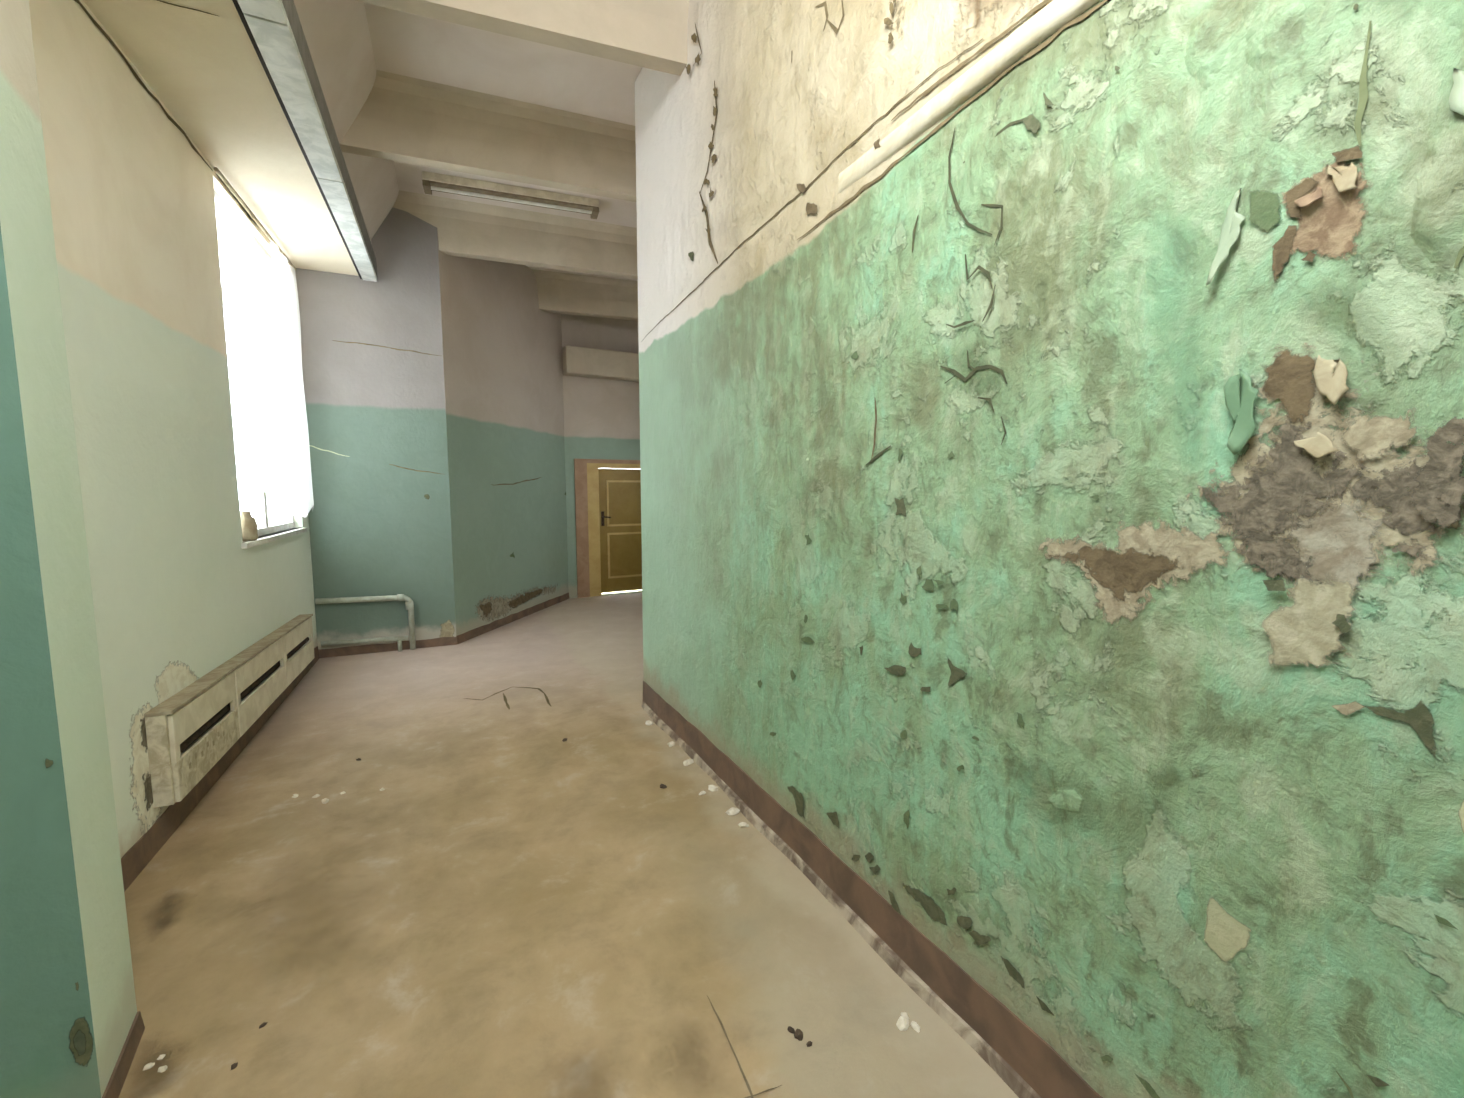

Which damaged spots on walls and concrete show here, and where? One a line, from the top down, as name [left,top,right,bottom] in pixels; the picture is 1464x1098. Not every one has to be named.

crack [74,0,258,227]
flaking render [1206,145,1372,286]
flaking render [1038,343,1464,667]
flaking render [129,662,199,833]
spalling [787,786,804,817]
spalling [827,812,839,828]
spalling [852,852,881,875]
spalling [888,883,991,945]
peeling [1204,898,1251,962]
spalling [1001,956,1054,1016]